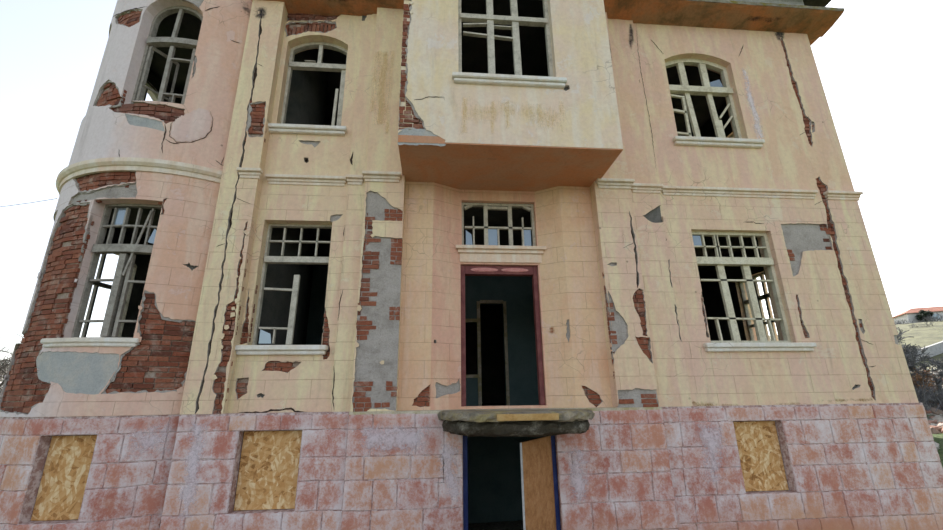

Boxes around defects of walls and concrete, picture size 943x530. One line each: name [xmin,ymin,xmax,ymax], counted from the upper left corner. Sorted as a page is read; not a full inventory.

spalling [116,10,142,27]
spalling [94,80,185,124]
crack [232,17,262,95]
spalling [398,0,425,131]
crack [781,41,813,140]
spalling [0,172,137,415]
spalling [102,290,196,394]
crack [197,134,253,411]
peeling [353,191,404,412]
peeling [602,263,651,379]
peeling [781,224,831,276]
crack [815,184,875,400]